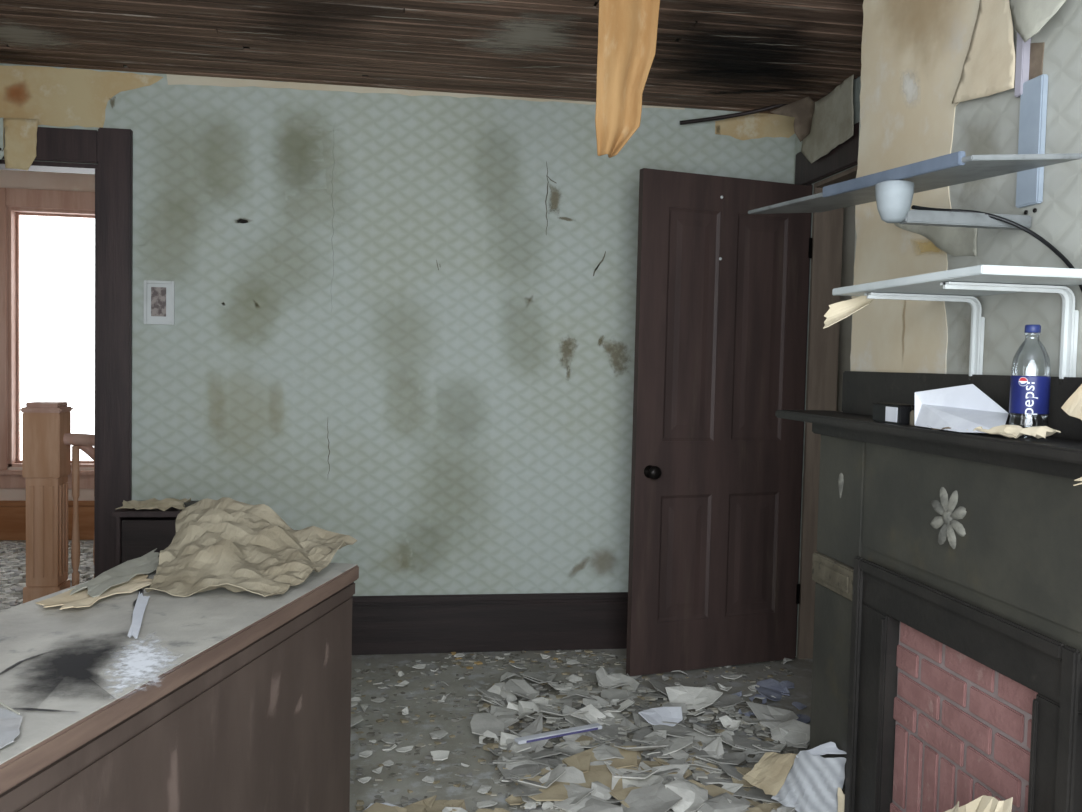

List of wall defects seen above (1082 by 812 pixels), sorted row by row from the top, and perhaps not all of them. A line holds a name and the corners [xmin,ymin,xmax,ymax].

damp [0,22,67,52]
damp [662,5,820,94]
peeling [0,0,685,171]
peeling [715,0,1066,178]
damp [550,192,571,221]
peeling [910,186,951,210]
peeling [850,201,977,374]
damp [562,339,572,377]
damp [599,338,626,370]